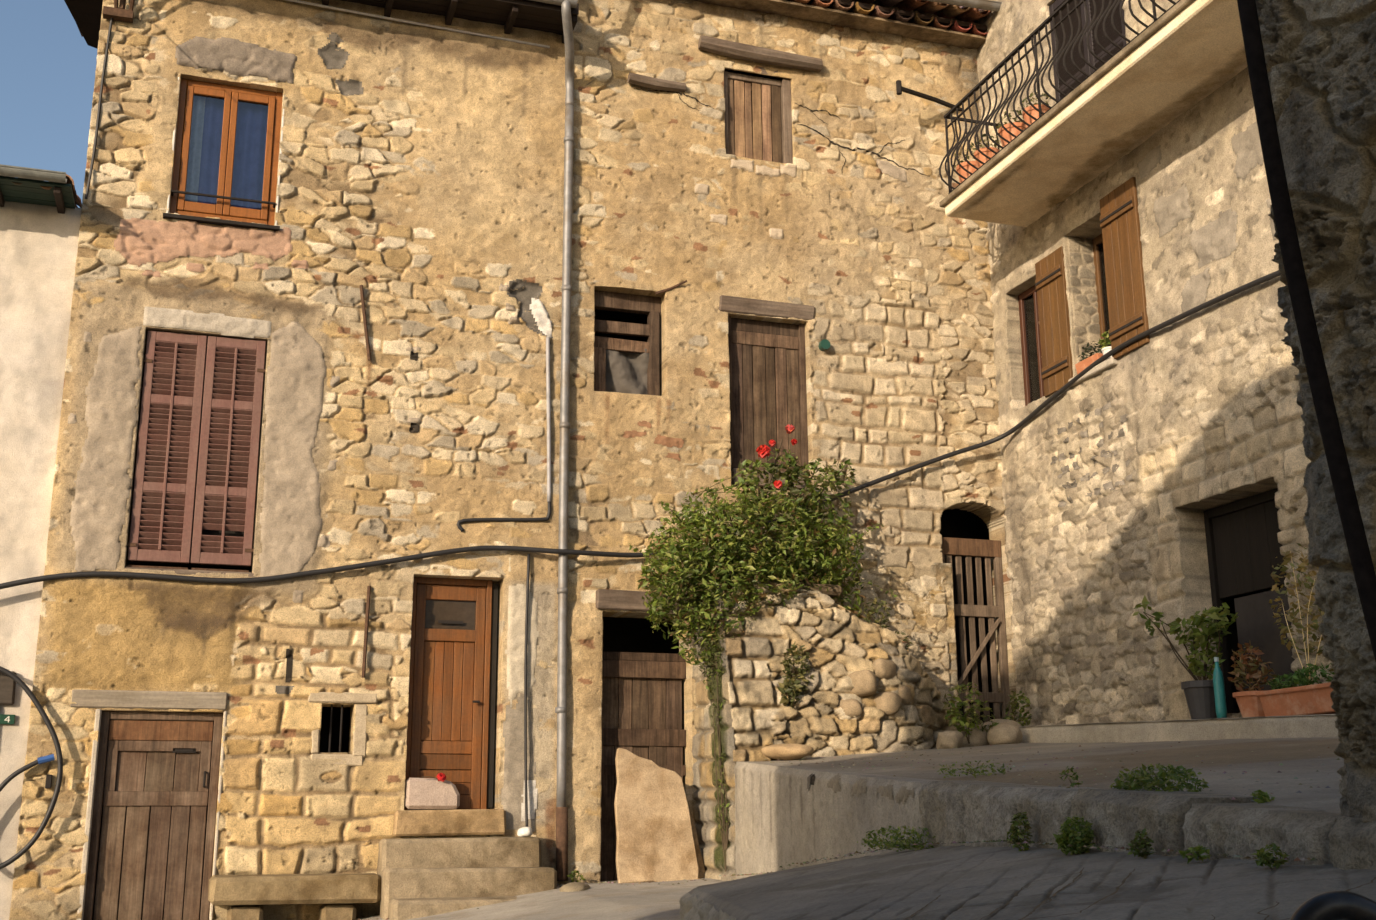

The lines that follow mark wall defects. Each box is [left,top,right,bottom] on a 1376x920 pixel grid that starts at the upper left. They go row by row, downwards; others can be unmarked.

crack [796,103,927,182]
leakage [131,584,269,638]
crack [980,868,1135,920]